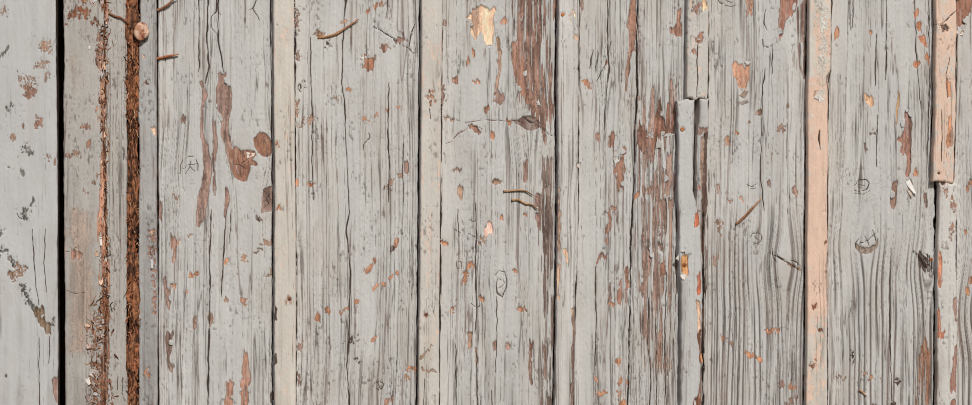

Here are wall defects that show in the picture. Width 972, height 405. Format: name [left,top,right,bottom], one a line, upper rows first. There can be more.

peeling [625,0,636,91]
peeling [732,60,751,105]
peeling [778,0,807,79]
peeling [147,72,257,315]
peeling [466,0,568,405]
peeling [595,78,677,376]
peeling [890,92,927,209]
peeling [34,305,51,335]
peeling [224,350,251,405]